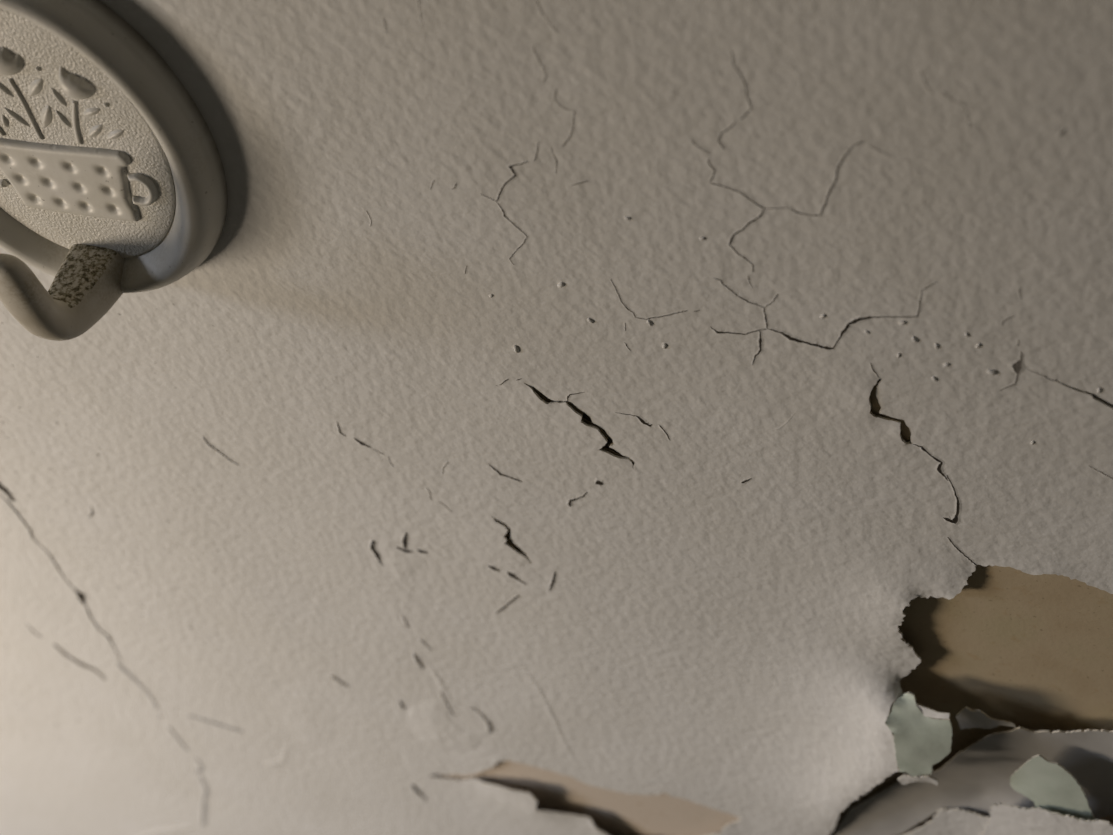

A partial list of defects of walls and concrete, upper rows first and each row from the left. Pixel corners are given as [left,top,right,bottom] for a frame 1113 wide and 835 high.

crack [429,0,589,265]
crack [610,51,937,365]
crack [998,288,1056,392]
crack [336,421,395,467]
crack [495,378,671,454]
crack [566,477,604,507]
crack [869,363,978,566]
crack [368,532,428,567]
crack [487,564,558,614]
crack [0,480,243,826]
peeling [833,565,1113,835]
peeling [480,760,737,835]